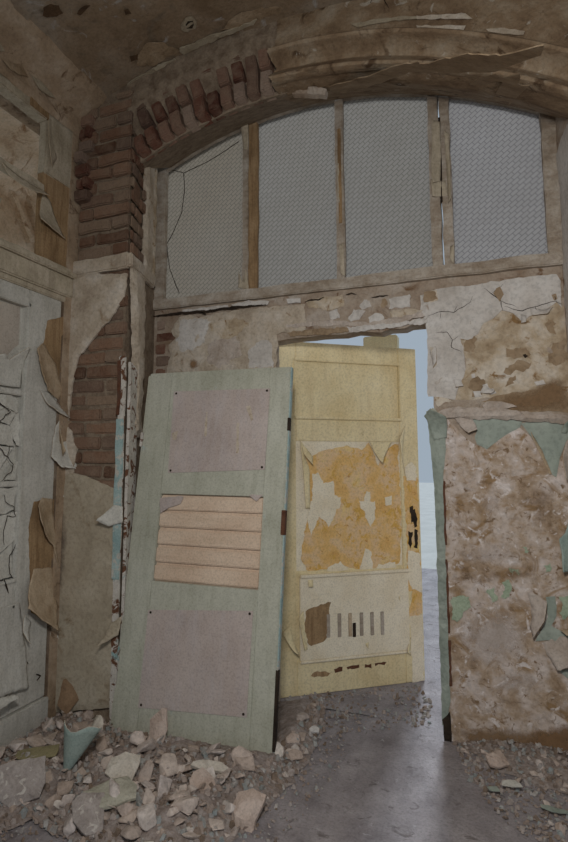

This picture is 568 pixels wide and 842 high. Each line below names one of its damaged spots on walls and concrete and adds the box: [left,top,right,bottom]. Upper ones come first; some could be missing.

peeling [352,13,472,30]
peeling [430,130,451,203]
flaking render [156,298,306,373]
crack [429,284,561,351]
flaking render [37,269,129,488]
peeling [0,394,20,580]
peeling [96,505,123,526]
peeling [420,274,568,742]
peeling [487,779,523,792]